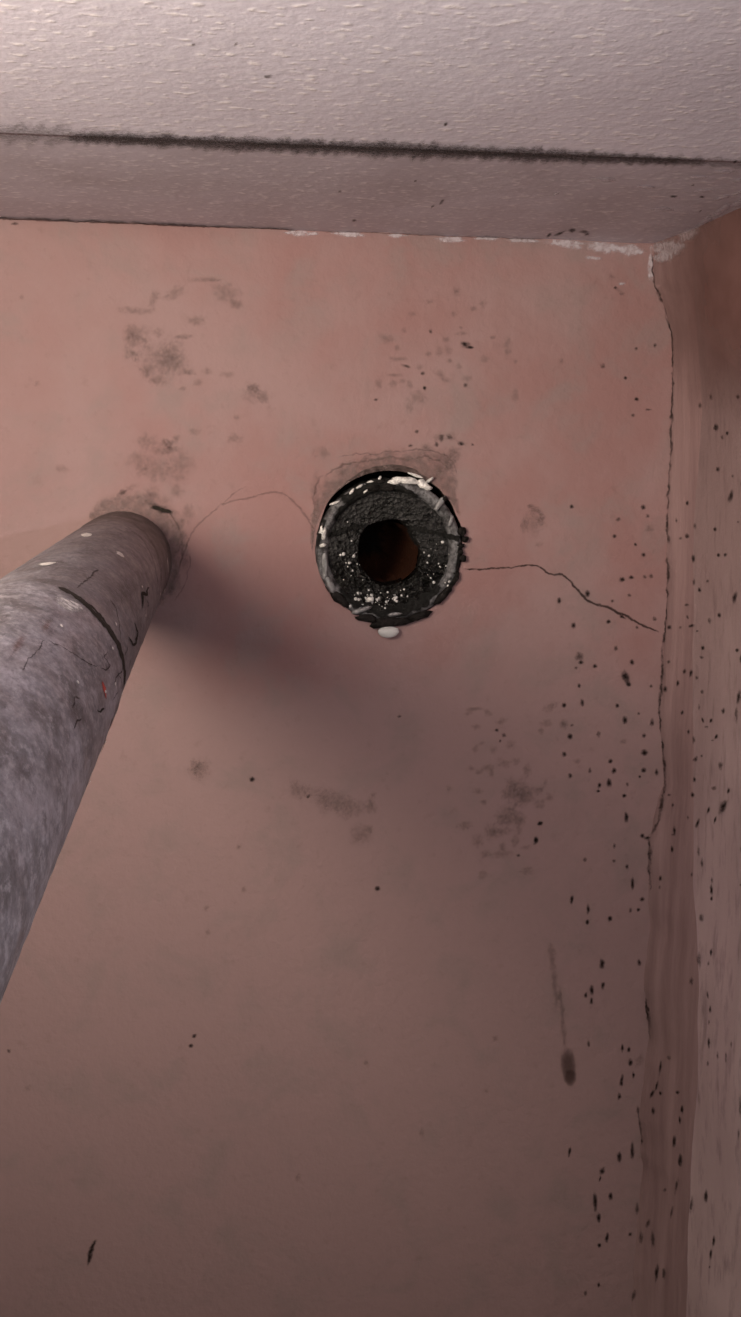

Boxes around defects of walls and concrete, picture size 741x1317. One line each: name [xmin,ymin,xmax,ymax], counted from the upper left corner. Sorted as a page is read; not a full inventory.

crack [468,258,674,889]
damp [563,1055,574,1083]